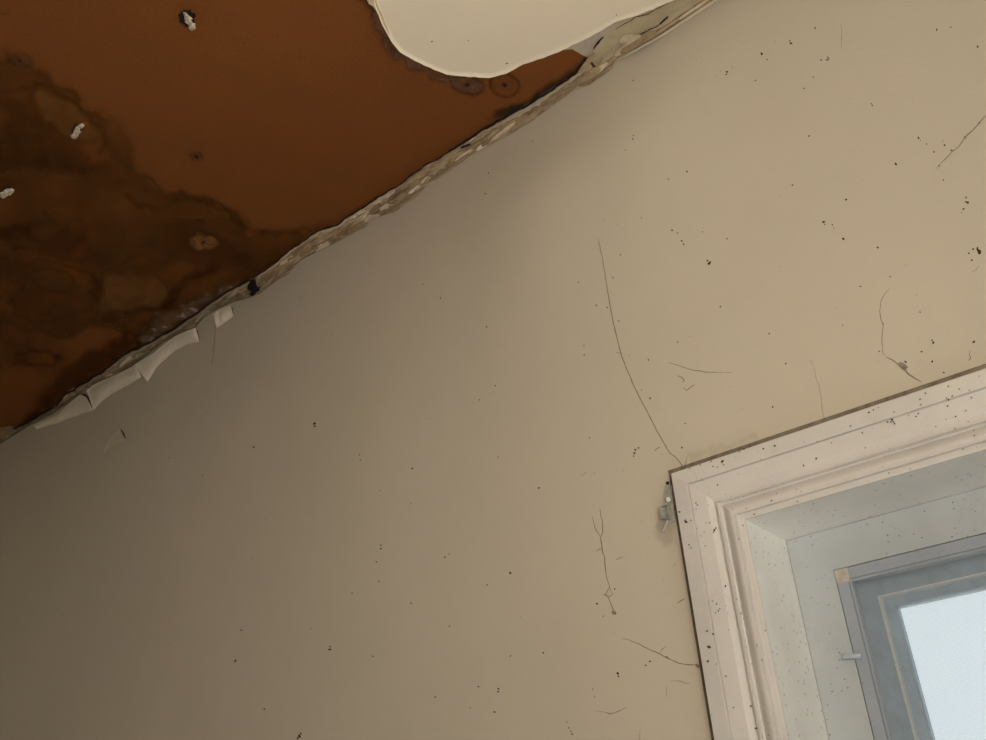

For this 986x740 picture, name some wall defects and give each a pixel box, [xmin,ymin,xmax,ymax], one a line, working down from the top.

peeling [367,0,673,78]
crack [938,116,986,167]
leakage [0,59,278,421]
crack [598,240,687,466]
crack [592,511,622,615]
crack [623,638,700,697]